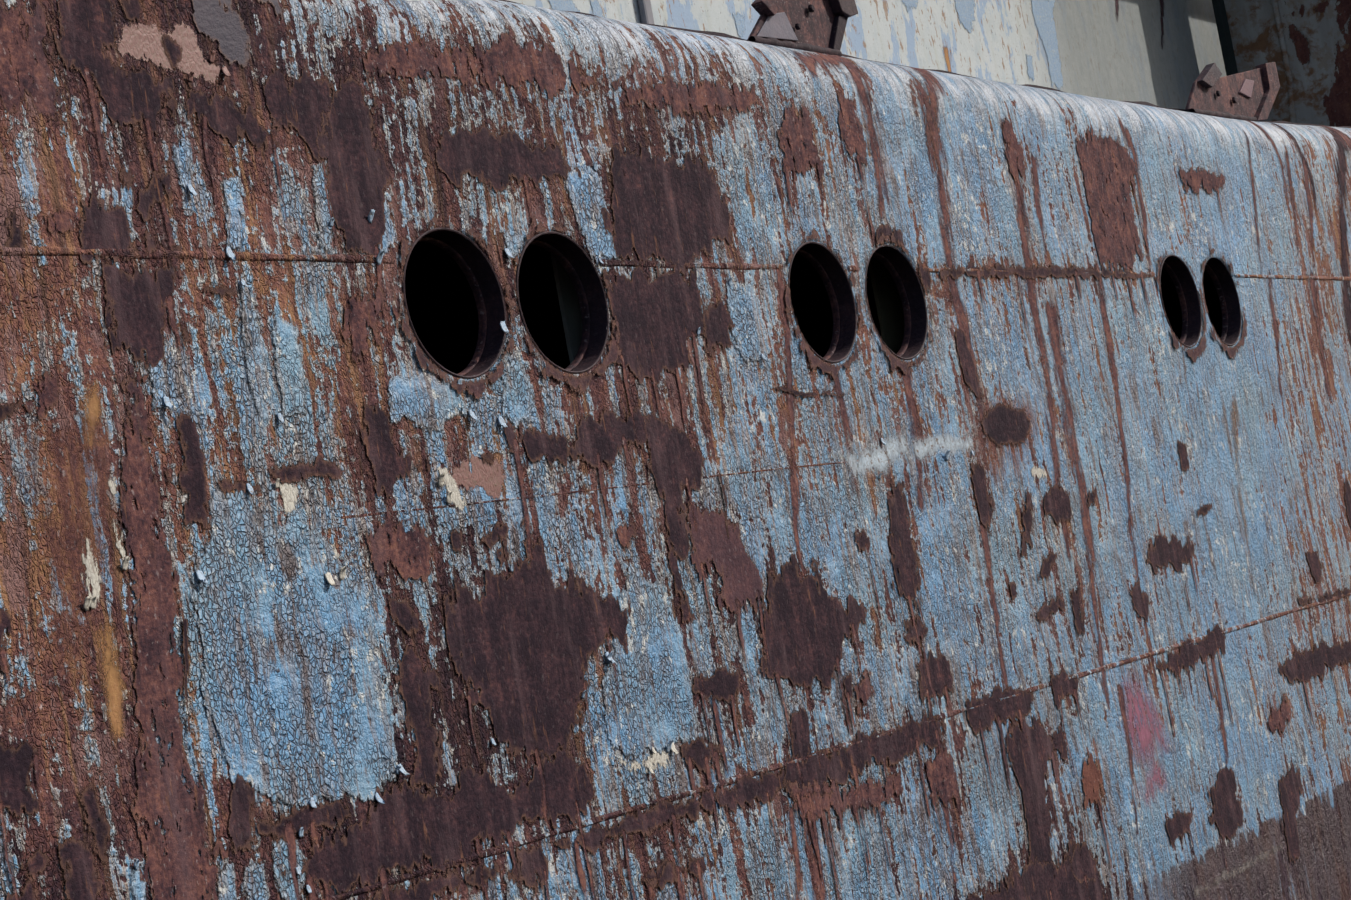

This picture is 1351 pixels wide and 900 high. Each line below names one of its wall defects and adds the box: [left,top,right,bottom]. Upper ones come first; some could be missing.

corrosion [161,34,183,70]
corrosion [192,0,255,69]
peeling [549,0,605,18]
peeling [955,0,976,33]
peeling [1026,0,1063,90]
corrosion [316,24,767,363]
corrosion [1283,0,1351,344]
corrosion [45,142,960,900]
corrosion [794,47,1244,900]
peeling [190,478,409,808]
corrosion [1265,639,1351,734]
corrosion [1279,759,1302,863]